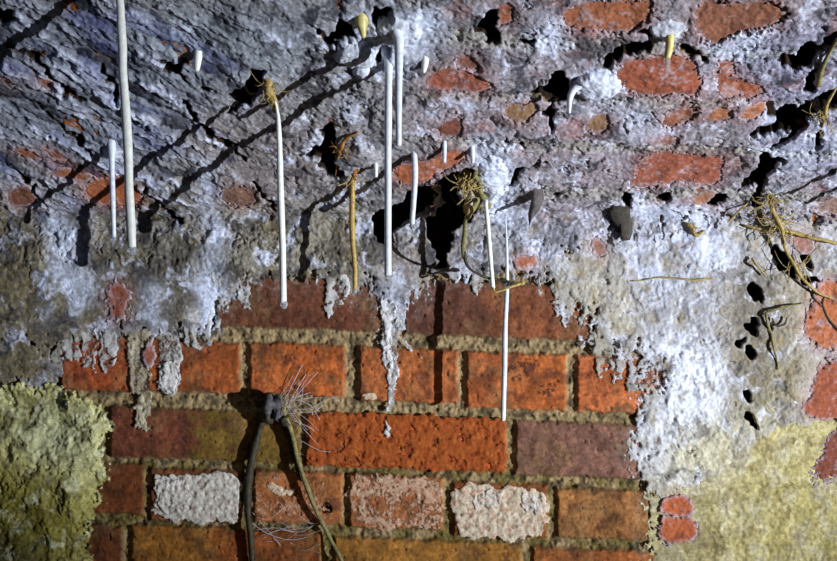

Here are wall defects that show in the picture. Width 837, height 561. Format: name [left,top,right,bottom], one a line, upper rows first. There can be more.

crack [5,44,87,102]
crack [38,102,92,154]
crack [101,63,119,101]
crack [158,57,247,161]
spalling [504,70,570,130]
flaking render [560,0,790,207]
crack [737,87,837,207]
hole [777,31,837,92]
water stain [0,0,837,432]
efflorescence [522,215,837,500]
hole [734,317,772,360]
spalling [305,411,509,473]